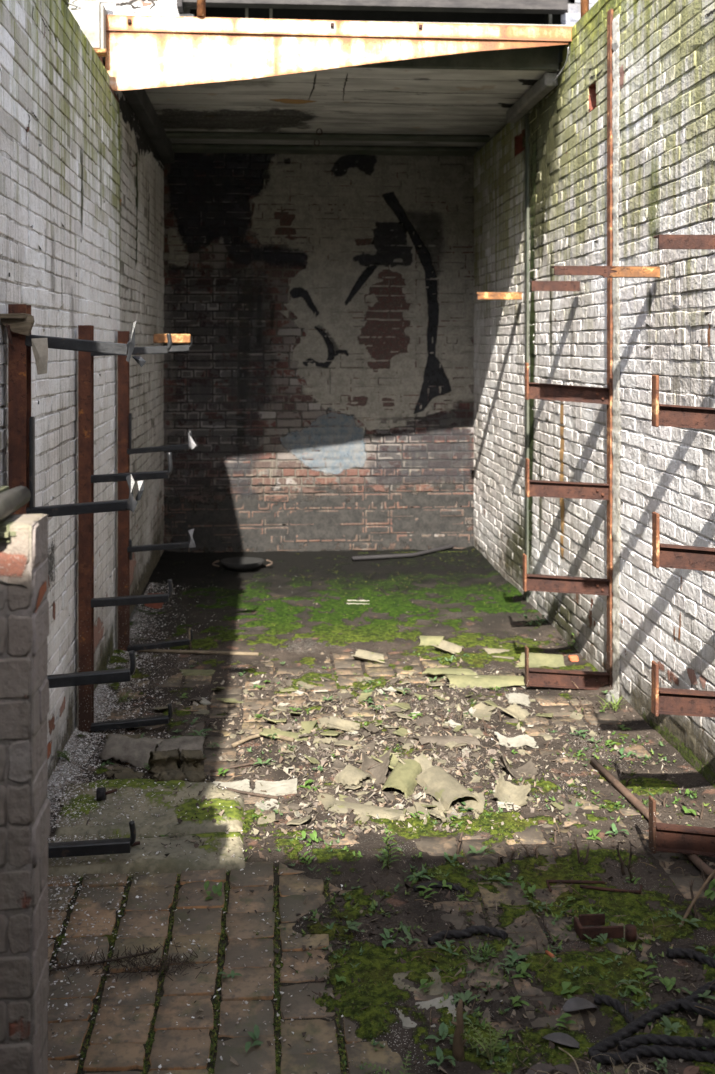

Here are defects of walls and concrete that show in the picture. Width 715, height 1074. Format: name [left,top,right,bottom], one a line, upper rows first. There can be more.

peeling [274,209,298,240]
peeling [353,220,413,372]
rust [153,334,191,343]
peeling [348,396,368,406]
water stain [48,540,57,592]